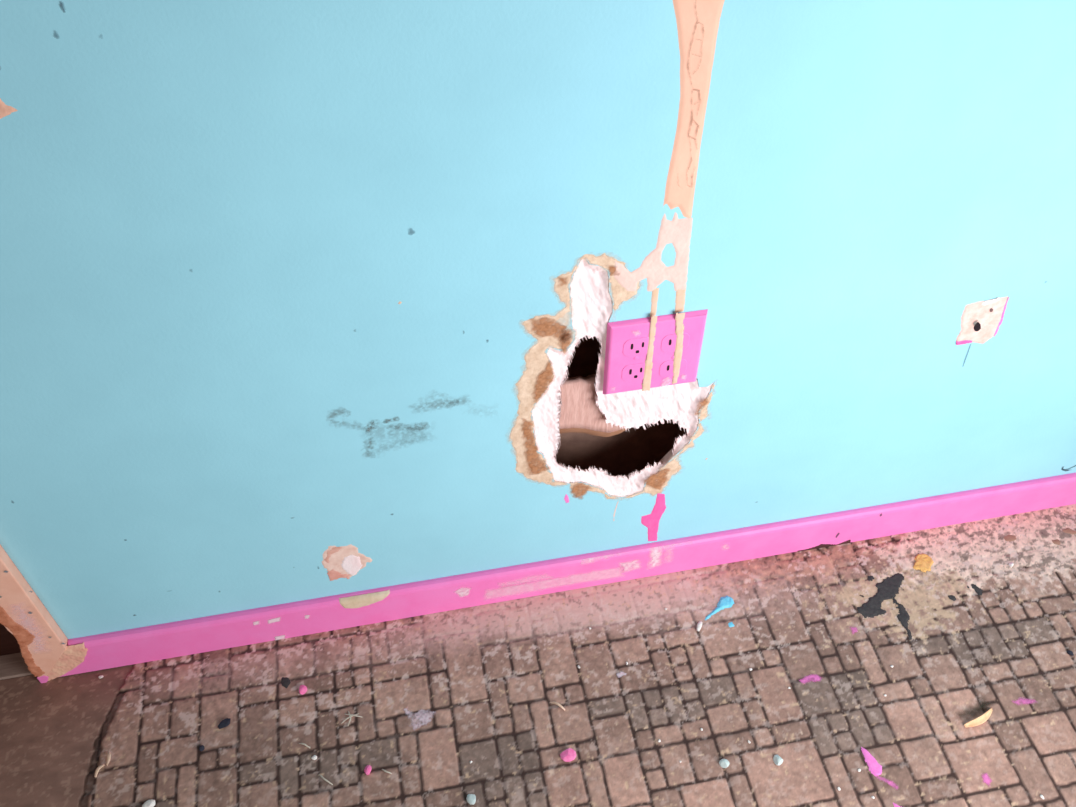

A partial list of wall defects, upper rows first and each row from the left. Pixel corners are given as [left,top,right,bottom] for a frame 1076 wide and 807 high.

peeling [0,99,18,119]
peeling [956,296,1009,345]
spalling [510,253,716,499]
peeling [322,544,372,581]
peeling [0,596,88,683]